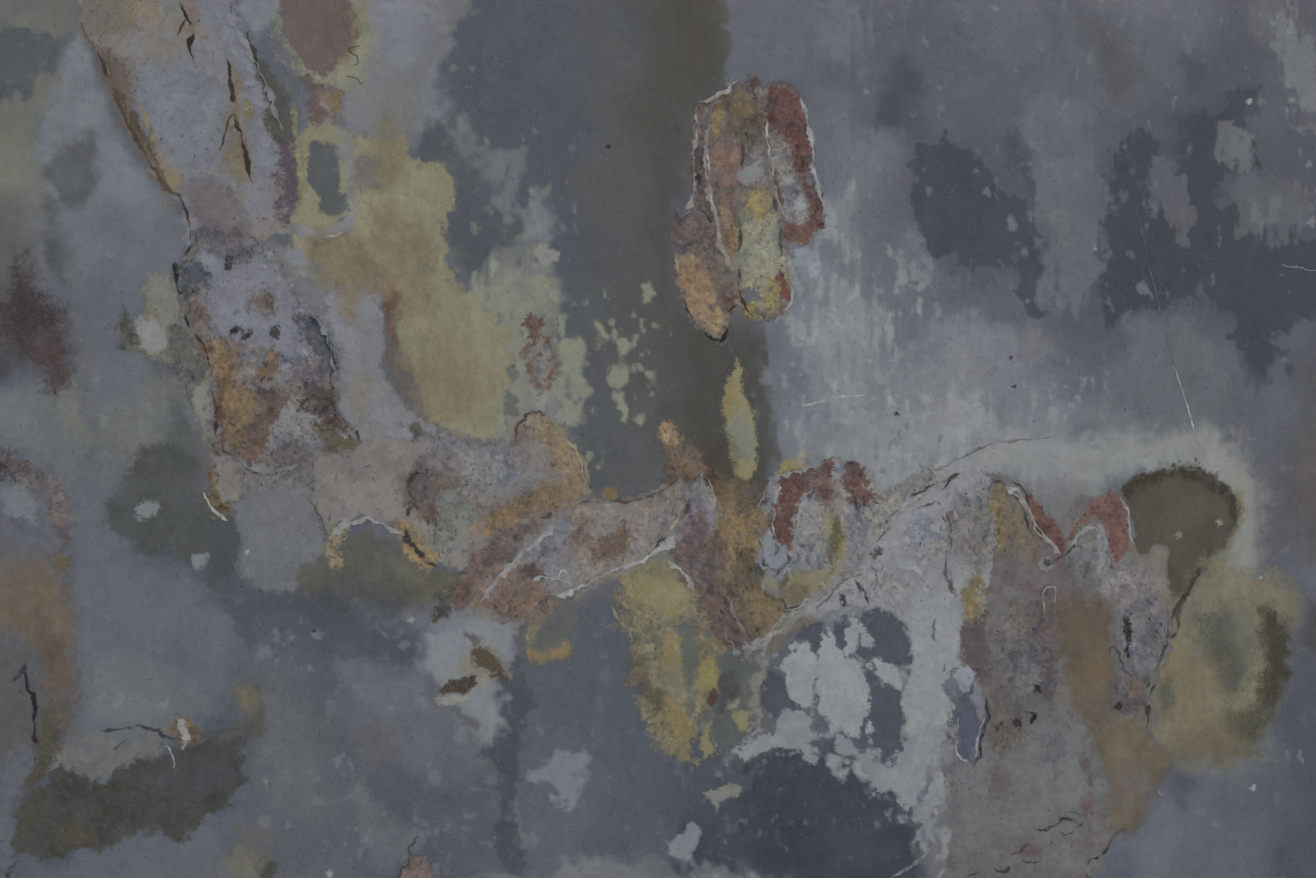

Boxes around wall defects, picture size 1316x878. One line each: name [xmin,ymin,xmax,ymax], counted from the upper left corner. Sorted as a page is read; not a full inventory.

flaking render [669,74,827,347]
leakage [279,108,521,444]
flaking render [518,307,564,400]
leakage [1118,461,1307,779]
crack [11,662,38,762]
peeling [702,783,742,812]
peeling [774,707,821,765]
peeling [779,614,875,739]
peeling [865,656,904,691]
peeling [865,679,908,758]
peeling [833,723,947,817]
peeling [940,665,991,763]